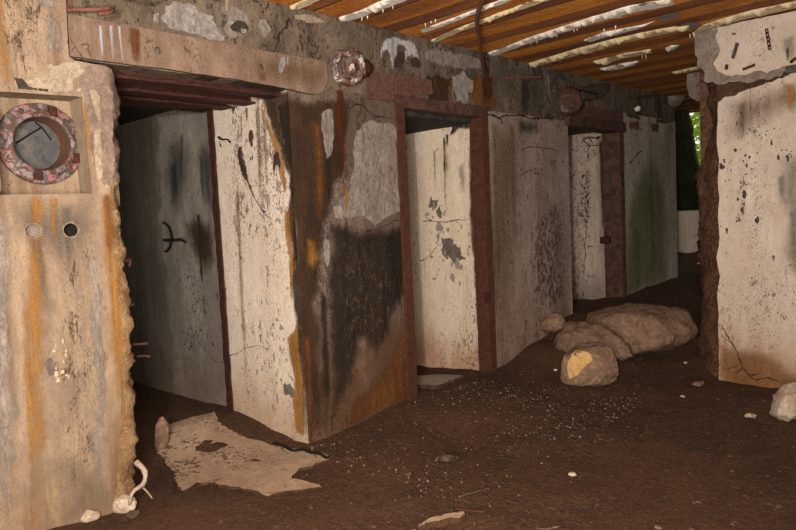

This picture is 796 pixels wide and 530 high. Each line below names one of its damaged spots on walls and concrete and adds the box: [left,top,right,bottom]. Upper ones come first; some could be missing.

peeling [154,1,272,41]
peeling [321,109,334,158]
peeling [333,120,400,225]
spalling [638,2,792,232]
corrosion [26,238,44,432]
corrosion [105,196,122,356]
damp [190,215,211,273]
corrosion [232,90,348,435]
peeling [324,239,339,268]
damp [322,225,403,399]
peeling [424,197,471,286]
crack [721,325,780,383]